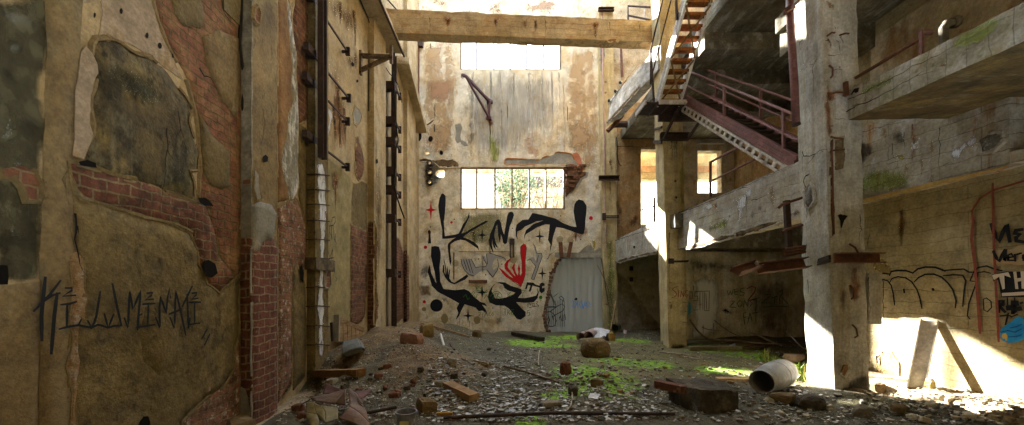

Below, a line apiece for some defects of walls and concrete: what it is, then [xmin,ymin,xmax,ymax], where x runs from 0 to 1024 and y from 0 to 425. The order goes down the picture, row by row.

flaking render [0,166,45,205]
crack [74,213,84,272]
peeling [62,0,308,425]
flaking render [349,104,379,332]
spalling [542,259,561,332]